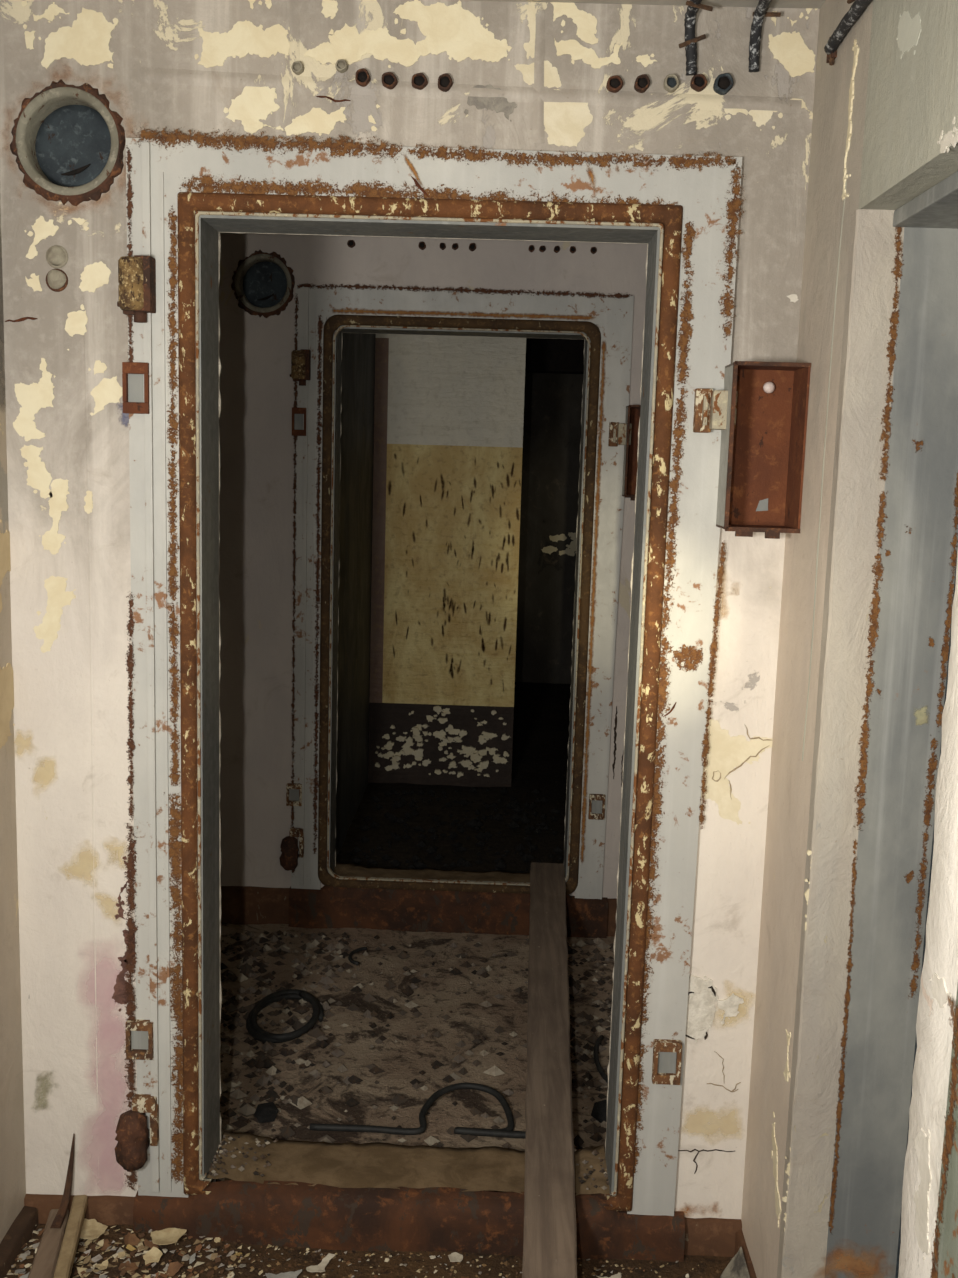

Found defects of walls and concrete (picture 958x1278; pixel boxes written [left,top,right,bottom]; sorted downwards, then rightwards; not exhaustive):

peeling [21,1,119,69]
peeling [194,0,290,68]
peeling [223,86,347,136]
peeling [304,0,623,147]
peeling [768,8,817,77]
peeling [13,358,70,555]
corrosion [123,127,744,1212]
corrosion [828,227,904,1232]
corrosion [904,473,958,998]
crack [686,1032,741,1092]
crack [678,1149,735,1174]
corrosion [929,997,958,1278]